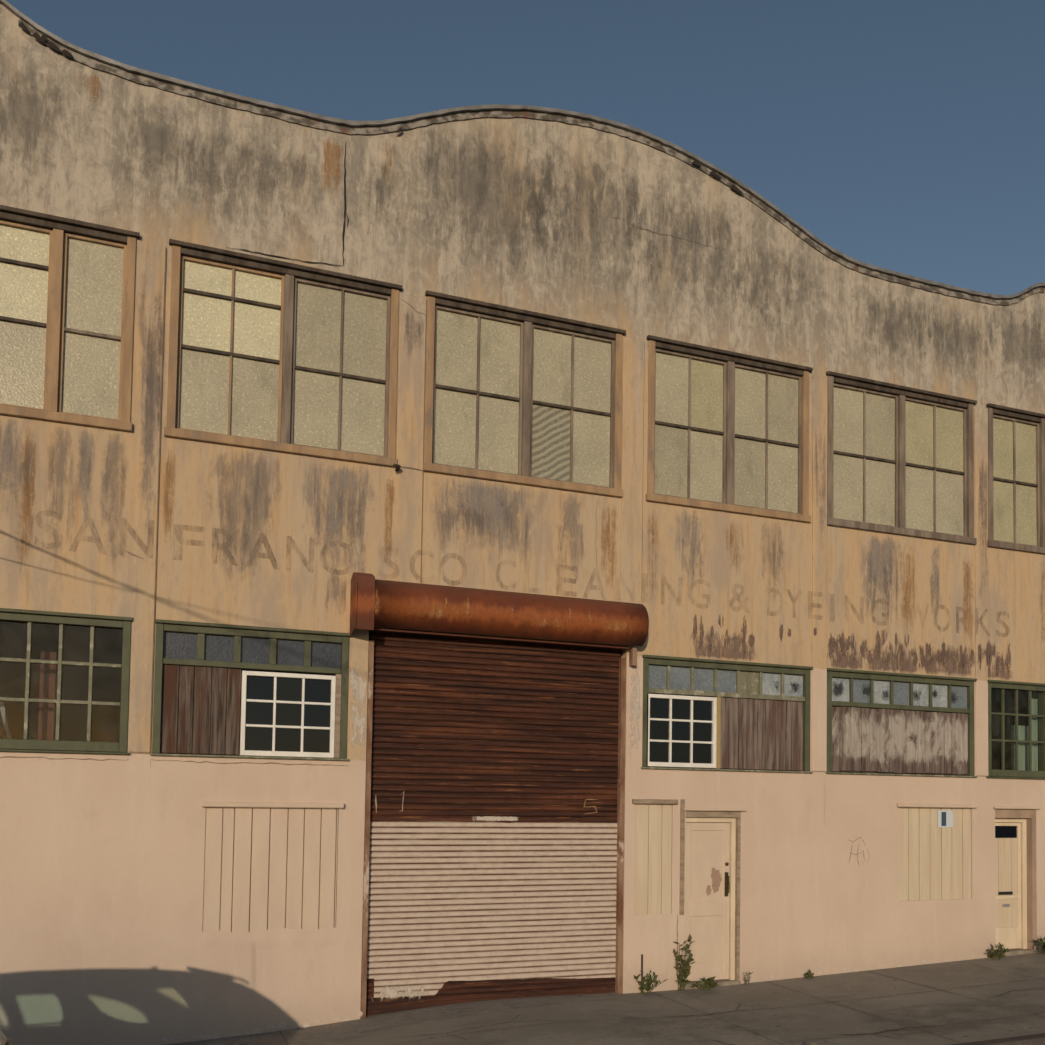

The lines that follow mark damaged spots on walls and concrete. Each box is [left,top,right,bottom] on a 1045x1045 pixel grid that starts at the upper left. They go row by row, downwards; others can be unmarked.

crack [227,143,349,266]
leakage [144,339,158,478]
peeling [692,614,755,660]
peeling [827,631,1011,679]